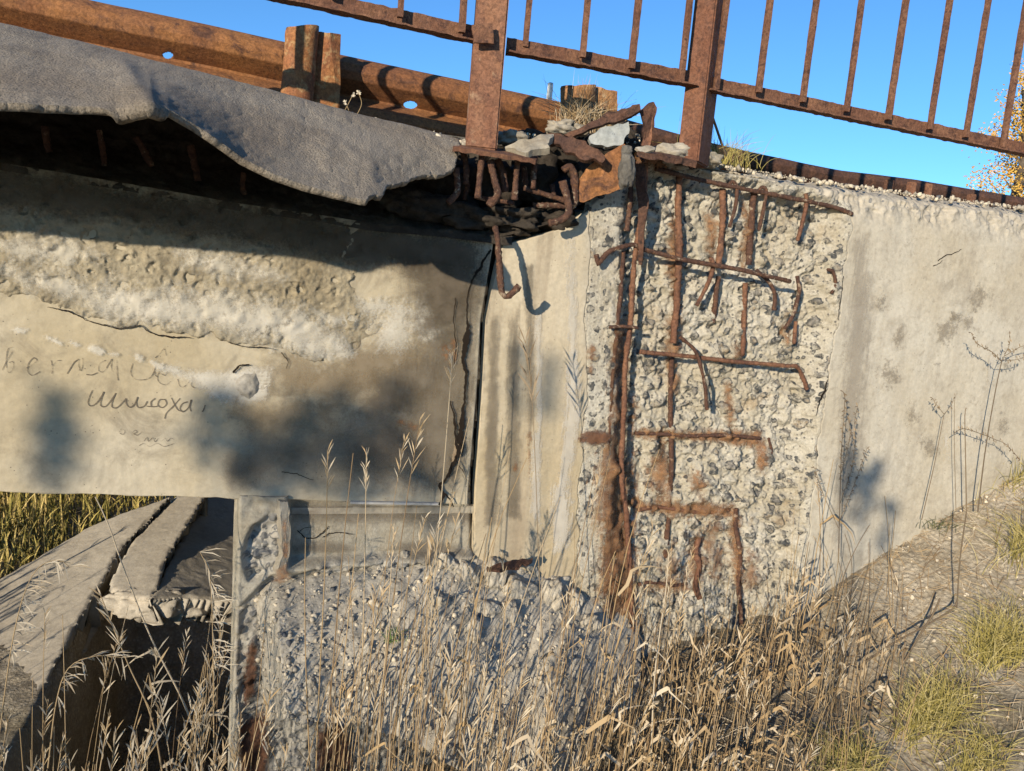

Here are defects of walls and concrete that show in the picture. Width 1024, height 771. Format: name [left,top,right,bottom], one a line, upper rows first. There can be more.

crack [49,307,190,338]
damp [0,170,485,485]
crack [229,342,289,373]
spalling [0,111,854,657]
crack [438,249,491,507]
corrosion [578,315,768,630]